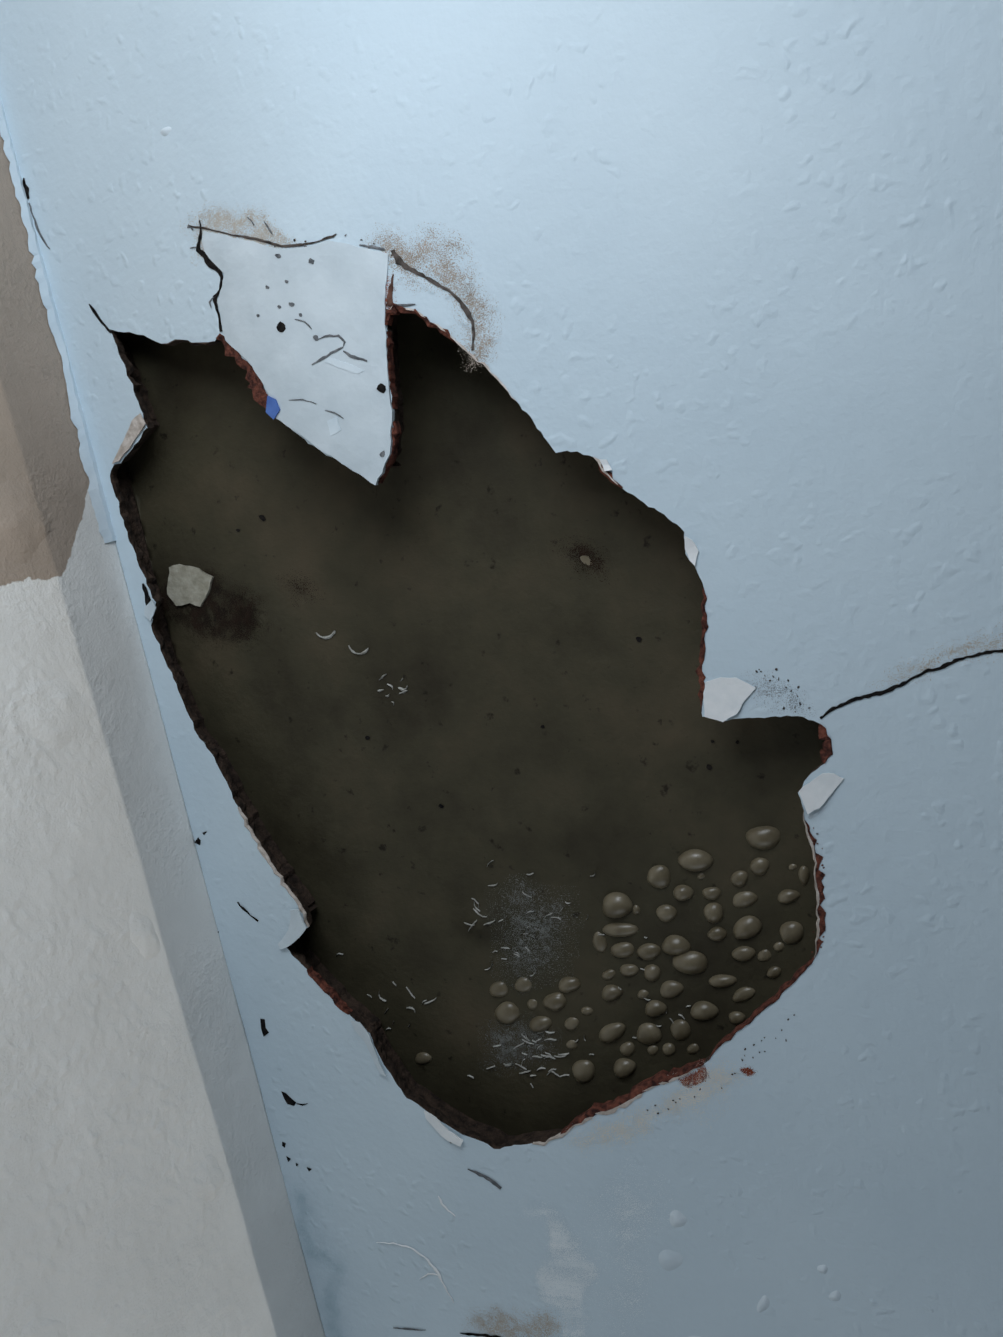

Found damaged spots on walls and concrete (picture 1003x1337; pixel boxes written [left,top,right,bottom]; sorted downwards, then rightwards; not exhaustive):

crack [89,304,112,333]
crack [187,217,475,350]
spalling [110,231,844,1149]
crack [820,649,1003,719]
crack [460,1329,501,1337]